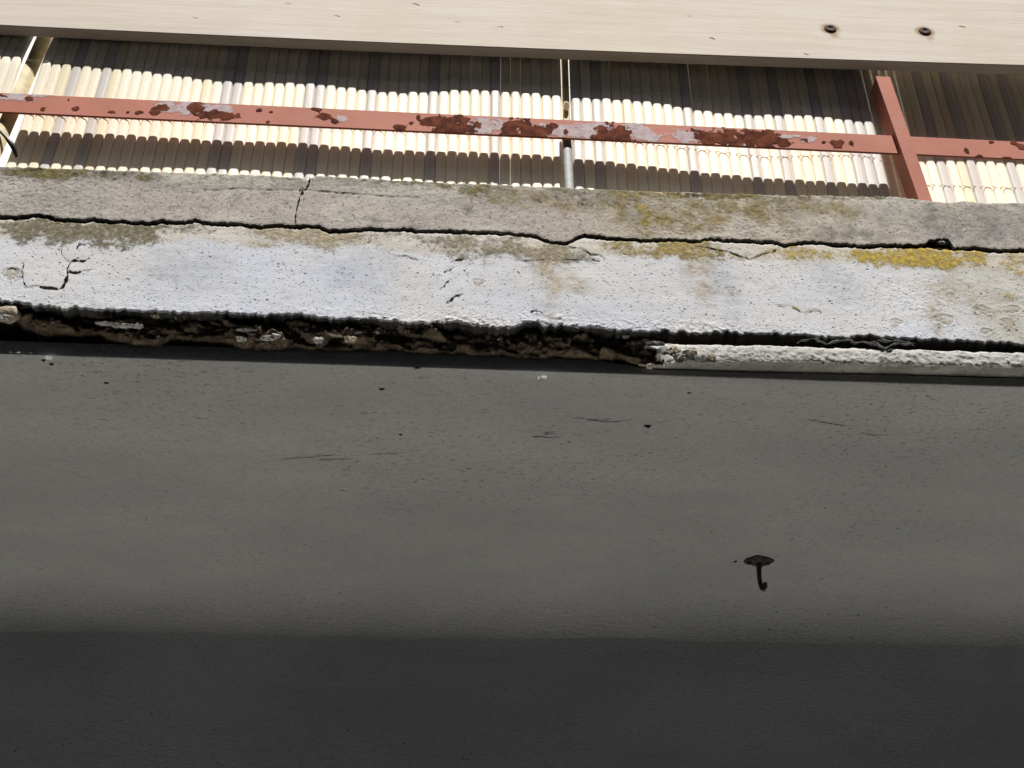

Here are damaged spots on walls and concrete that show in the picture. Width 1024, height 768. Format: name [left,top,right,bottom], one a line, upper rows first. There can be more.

rust [186,102,240,120]
rust [311,107,339,124]
rust [393,114,569,138]
rust [589,121,636,141]
rust [686,127,808,147]
rust [822,139,854,148]
crack [0,178,1024,303]
spalling [0,304,716,370]